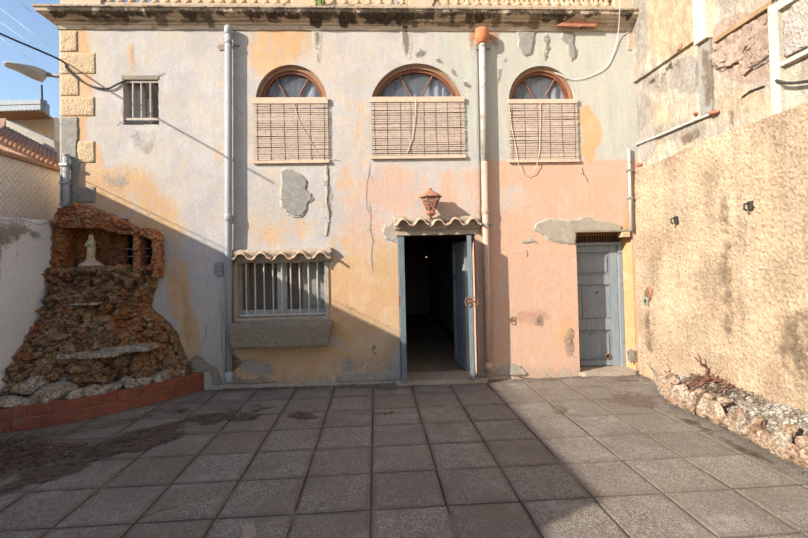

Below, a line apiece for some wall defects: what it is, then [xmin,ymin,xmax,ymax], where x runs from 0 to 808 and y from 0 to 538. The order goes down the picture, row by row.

water stain [47,5,600,61]
spalling [710,13,769,75]
water stain [0,222,40,256]